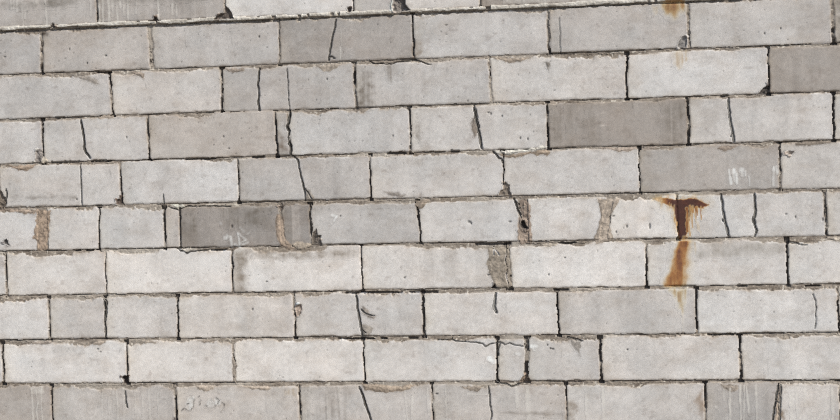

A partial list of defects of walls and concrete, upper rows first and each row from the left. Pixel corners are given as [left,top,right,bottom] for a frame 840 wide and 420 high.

spalling [389,0,412,15]
corrosion [649,0,690,24]
crack [80,120,90,206]
crack [286,72,312,201]
crack [474,109,503,162]
crack [720,194,729,236]
crack [751,194,759,236]
corrosion [644,193,720,334]
crack [359,388,371,420]
crack [450,339,524,418]